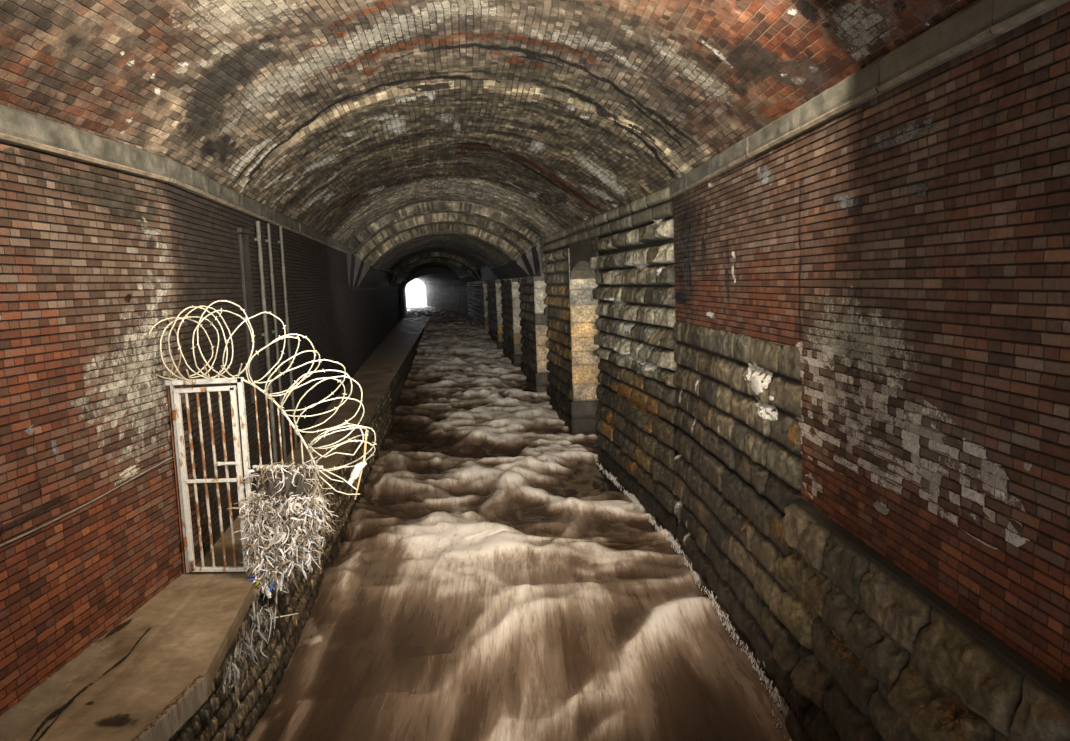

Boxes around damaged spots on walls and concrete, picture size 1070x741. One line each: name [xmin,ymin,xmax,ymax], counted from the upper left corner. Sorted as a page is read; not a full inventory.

corrosion [274,31,603,96]
crack [235,43,698,189]
damp [651,39,733,106]
damp [139,218,168,262]
damp [75,270,173,462]
damp [796,285,1030,550]